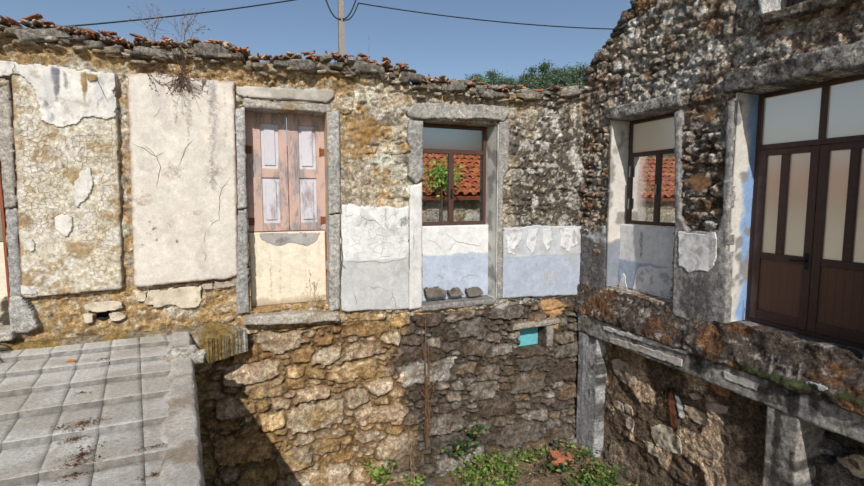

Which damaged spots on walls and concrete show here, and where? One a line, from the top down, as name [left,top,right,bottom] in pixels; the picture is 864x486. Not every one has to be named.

flaking render [0,61,117,127]
flaking render [55,167,93,236]
crack [12,62,236,298]
peeling [260,232,320,246]
flaking render [21,285,37,295]
peeling [643,440,663,459]